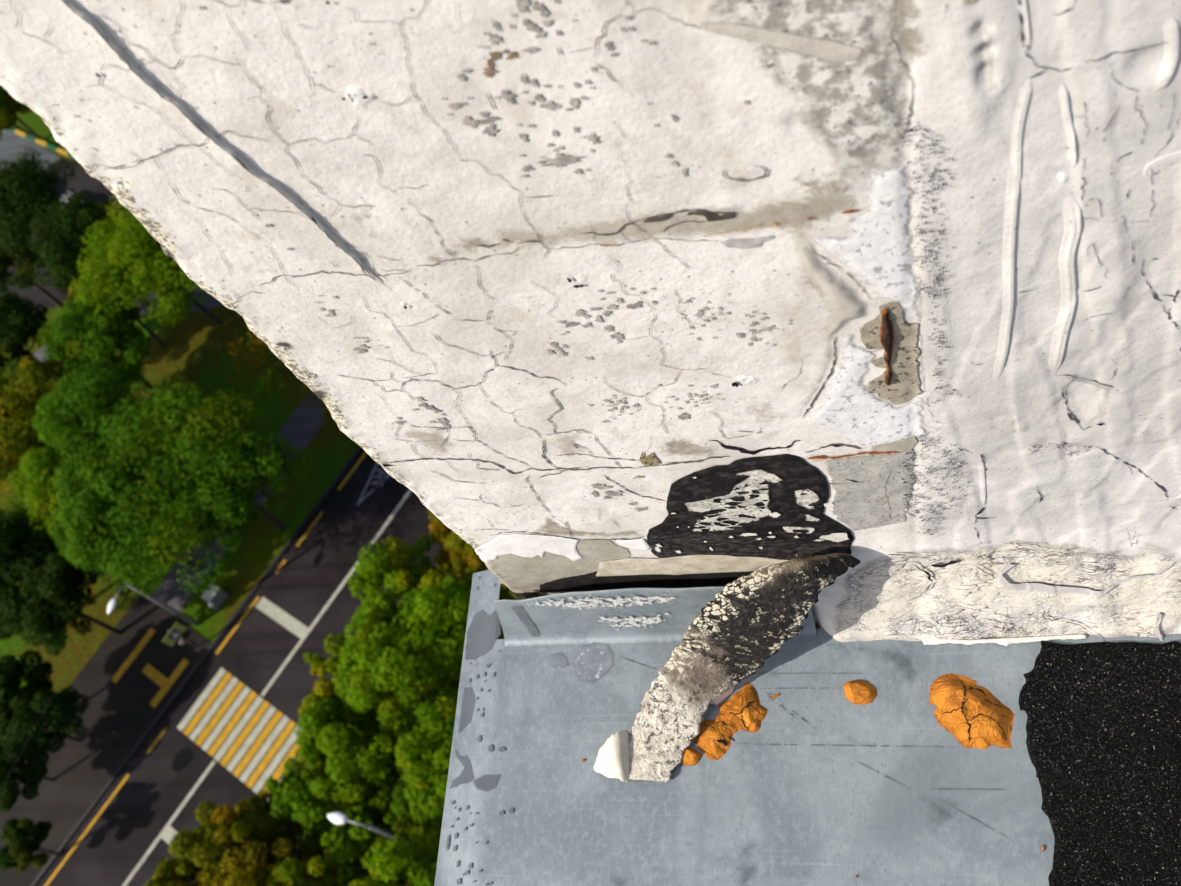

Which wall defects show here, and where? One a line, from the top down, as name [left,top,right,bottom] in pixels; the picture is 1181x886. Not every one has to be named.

crack [891,32,914,144]
crack [86,0,861,540]
peeling [644,213,673,222]
peeling [671,0,926,551]
crack [1018,0,1181,351]
peeling [486,539,630,599]
peeling [590,395,639,423]
peeling [657,378,724,420]
crack [828,466,917,521]
crack [849,448,1134,604]
crack [1037,598,1107,642]
crack [1059,367,1177,510]